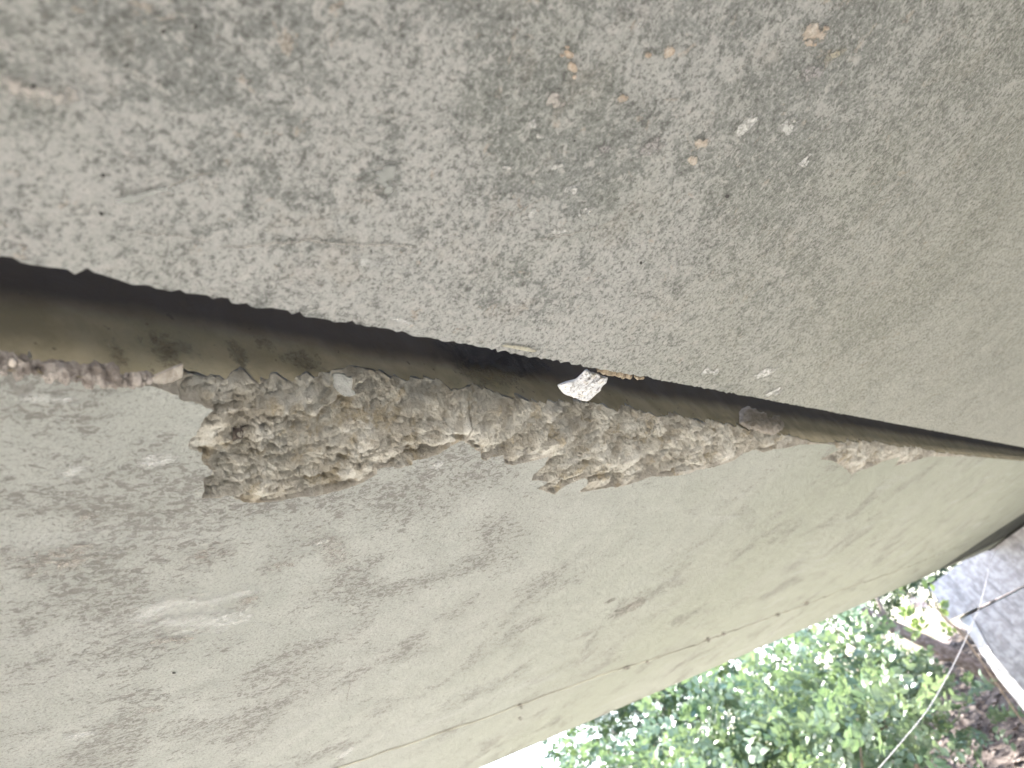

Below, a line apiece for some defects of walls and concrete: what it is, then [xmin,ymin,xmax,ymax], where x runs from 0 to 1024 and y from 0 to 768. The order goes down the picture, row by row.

spalling [0,350,983,503]